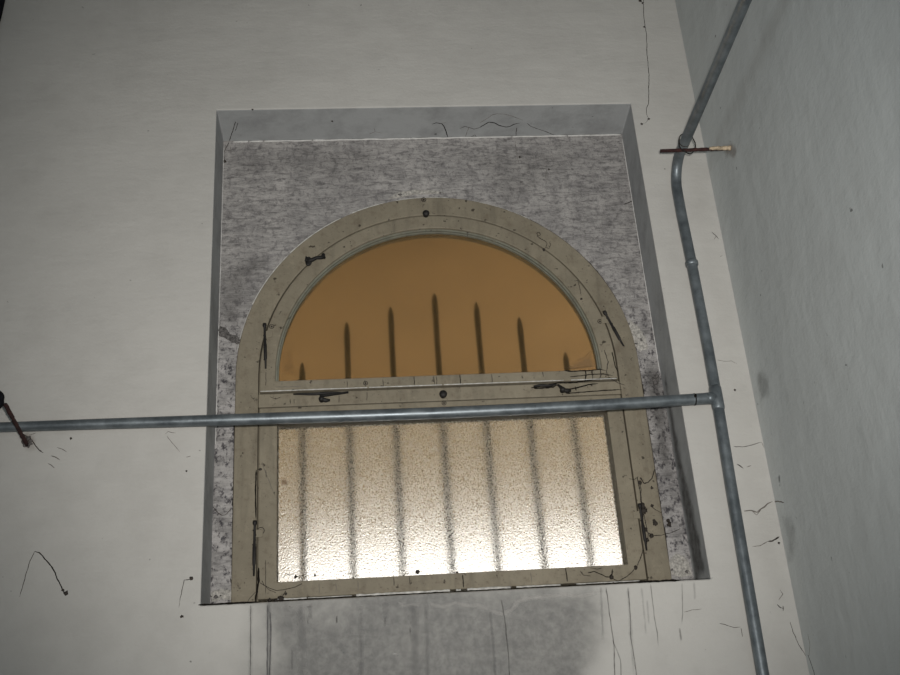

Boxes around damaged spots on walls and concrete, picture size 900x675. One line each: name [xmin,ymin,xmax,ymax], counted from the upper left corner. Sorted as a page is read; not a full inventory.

crack [639,0,650,125]
crack [433,114,553,162]
crack [745,501,784,514]
crack [20,551,68,596]
damp [283,594,575,675]